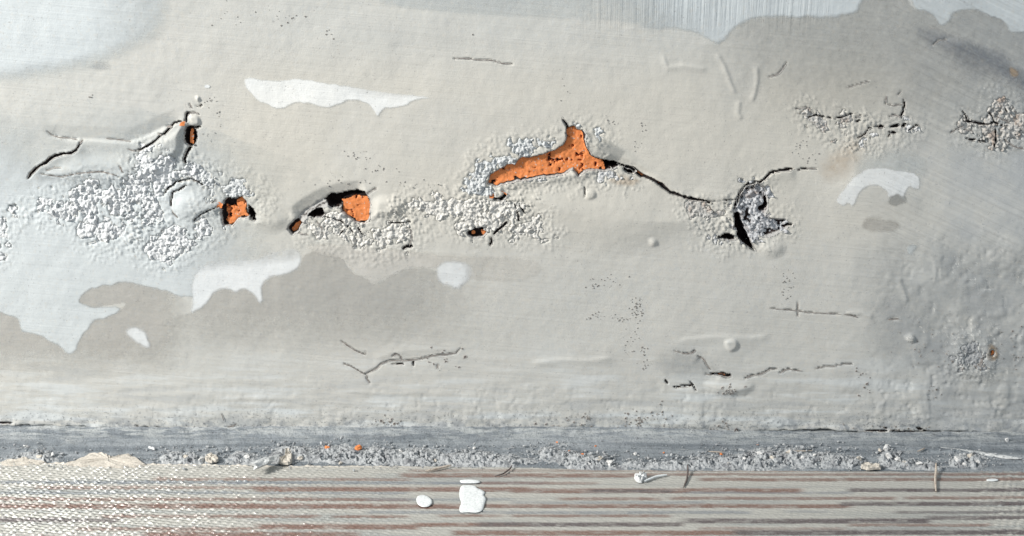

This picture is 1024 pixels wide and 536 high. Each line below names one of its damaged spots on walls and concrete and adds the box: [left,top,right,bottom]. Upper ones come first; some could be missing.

crack [28,104,219,221]
spalling [37,142,258,269]
spalling [287,118,643,256]
crack [616,162,816,209]
spalling [685,177,794,251]
crack [797,81,919,138]
crack [951,109,1024,149]
water stain [0,313,64,354]
water stain [78,282,167,353]
water stain [201,252,421,322]
crack [341,341,461,383]
crack [665,350,849,390]